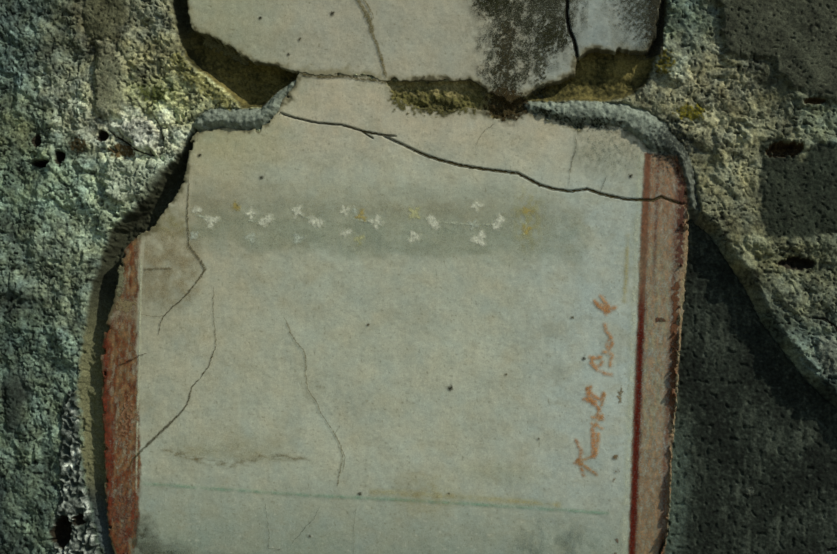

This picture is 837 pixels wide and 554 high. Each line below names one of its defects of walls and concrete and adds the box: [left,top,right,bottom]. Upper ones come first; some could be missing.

spalling [170,0,298,109]
crack [301,0,387,83]
spalling [387,0,669,119]
water stain [471,0,631,166]
crack [565,0,578,57]
crack [282,113,681,204]
water stain [646,117,698,172]
crack [141,180,206,331]
peeling [676,175,687,267]
spalling [76,127,201,554]
crack [129,340,216,468]
peeling [656,277,680,424]